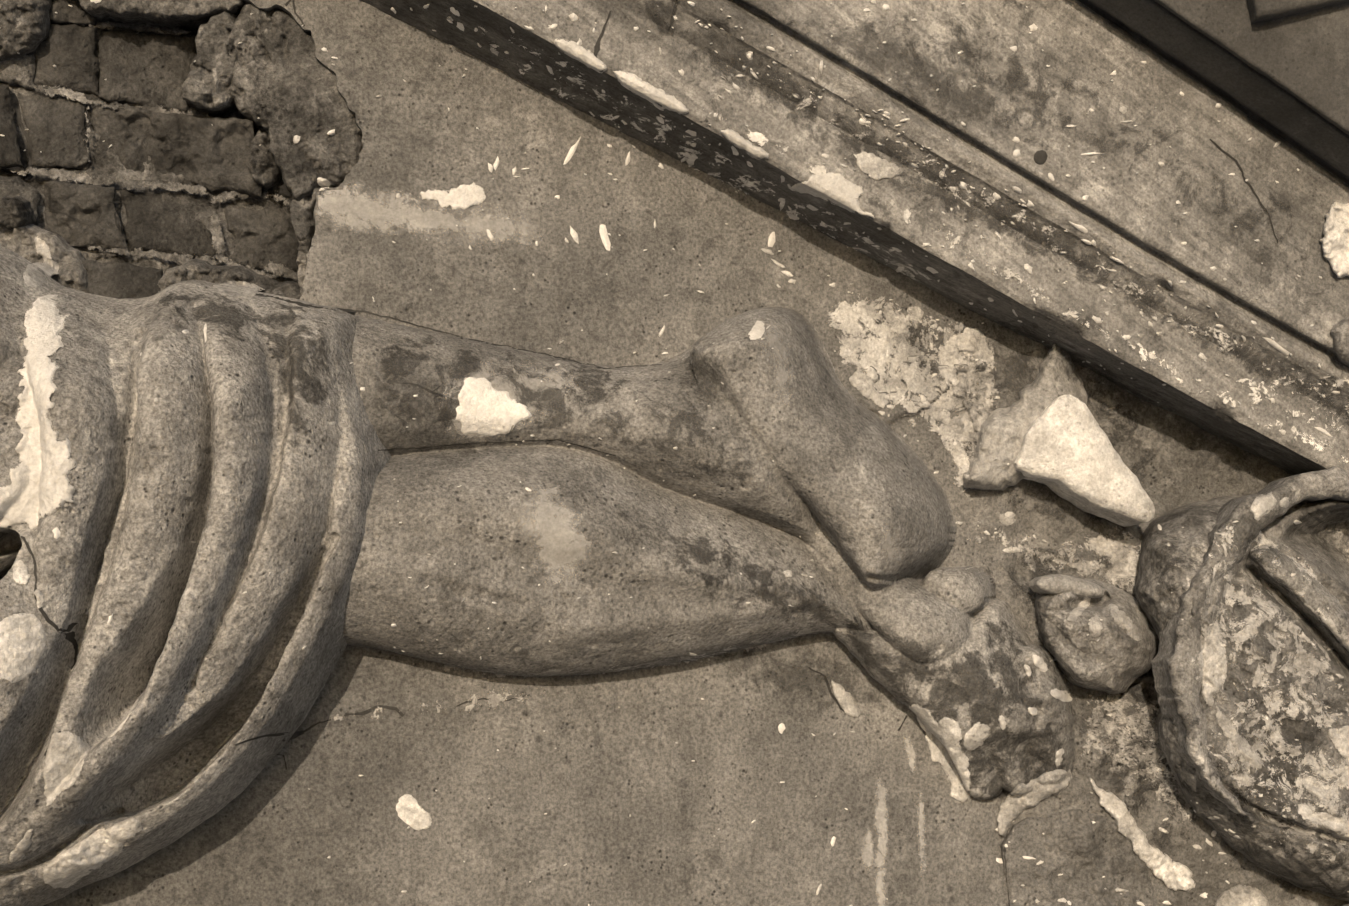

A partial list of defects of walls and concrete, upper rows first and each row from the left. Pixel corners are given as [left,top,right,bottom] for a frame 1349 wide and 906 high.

flaking render [0,0,362,533]
peeling [455,376,532,436]
peeling [478,26,934,280]
peeling [824,293,999,492]
peeling [1001,209,1059,252]
peeling [932,229,1349,463]
crack [1209,139,1278,243]
crack [20,536,78,670]